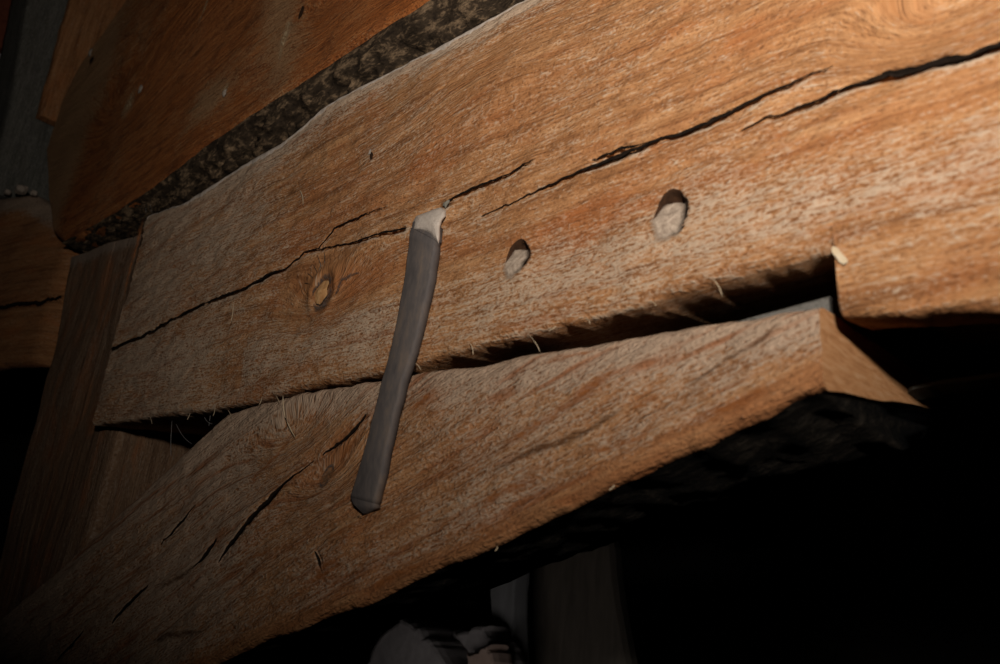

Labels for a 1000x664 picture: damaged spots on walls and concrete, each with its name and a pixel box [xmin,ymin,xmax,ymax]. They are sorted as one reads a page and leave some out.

crack [449,159,534,201]
crack [482,42,1000,216]
crack [111,207,406,350]
crack [161,505,195,544]
crack [192,414,366,568]